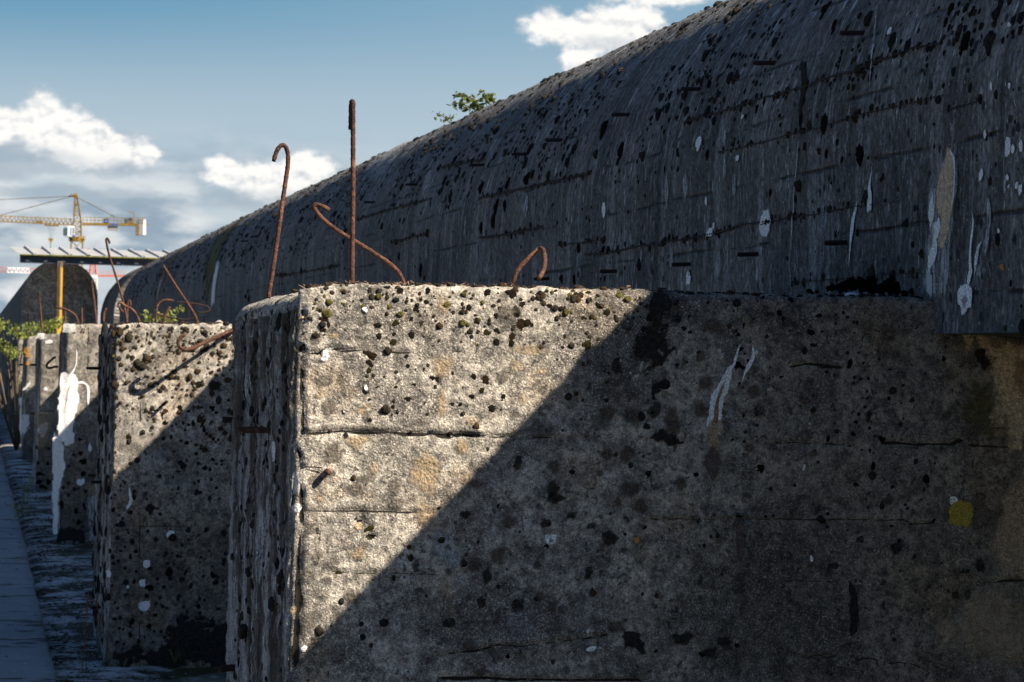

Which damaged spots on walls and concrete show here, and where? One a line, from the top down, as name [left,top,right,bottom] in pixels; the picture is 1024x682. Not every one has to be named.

efflorescence [957,198,991,315]
damp [19,350,90,535]
damp [704,345,766,480]